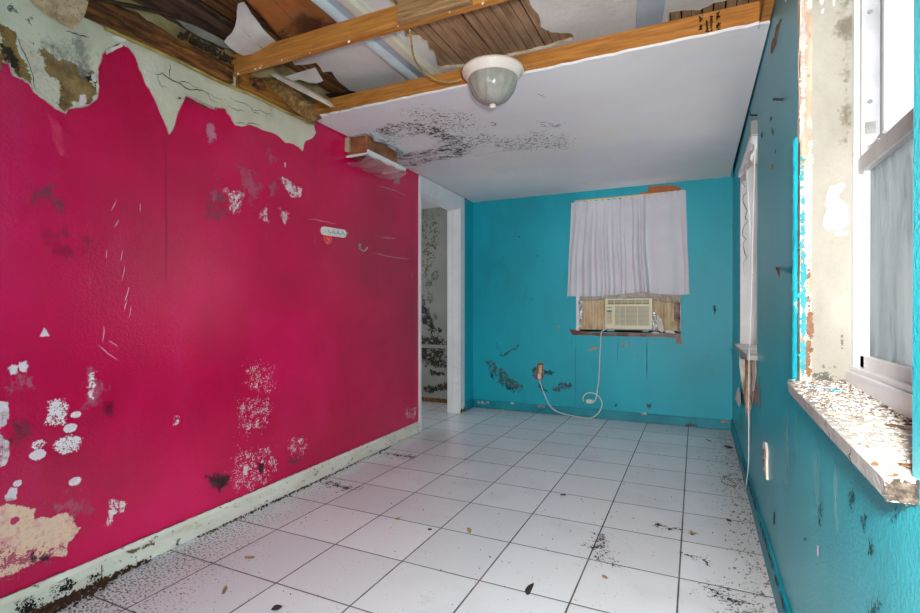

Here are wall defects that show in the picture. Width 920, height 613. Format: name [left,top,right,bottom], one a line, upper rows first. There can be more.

flaking render [404,0,574,69]
flaking render [0,0,316,151]
crack [155,68,268,125]
water stain [376,106,574,167]
mould [421,210,447,393]
water stain [485,355,524,393]
water stain [533,367,572,392]
peeling [0,360,33,467]
peeling [29,398,83,461]
peeling [229,445,278,493]
peeling [0,477,93,585]
peeling [106,499,126,525]